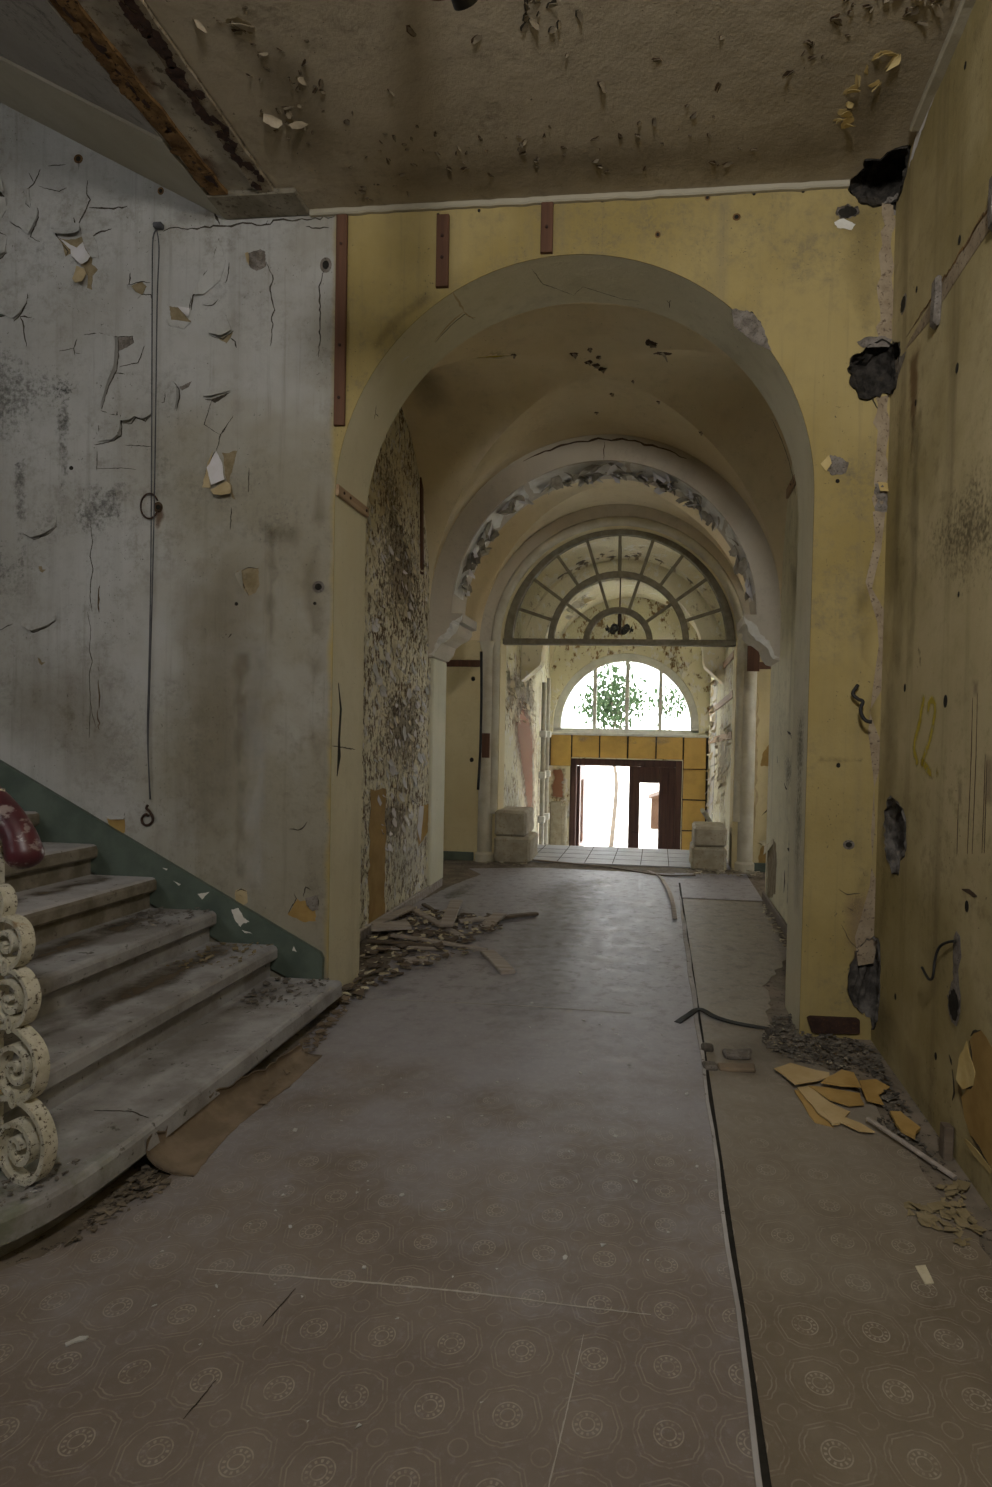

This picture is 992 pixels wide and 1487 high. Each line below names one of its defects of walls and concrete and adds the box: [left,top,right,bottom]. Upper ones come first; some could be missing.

peeling [50,181,111,290]
spalling [245,249,266,271]
peeling [127,275,151,298]
peeling [166,301,191,329]
peeling [208,314,237,348]
peeling [81,333,230,445]
peeling [202,422,237,529]